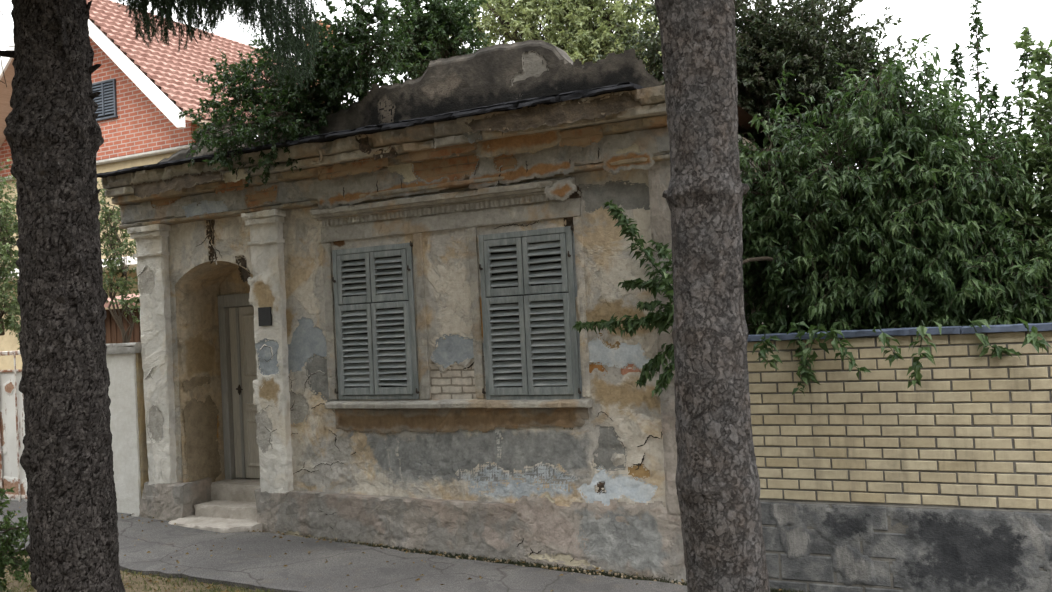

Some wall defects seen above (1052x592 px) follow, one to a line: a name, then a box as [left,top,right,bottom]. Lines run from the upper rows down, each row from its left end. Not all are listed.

flaking render [255,317,339,426]
flaking render [422,334,486,400]
flaking render [578,332,650,398]
crack [596,409,662,470]
leakage [769,502,876,587]
leakage [886,507,1052,592]